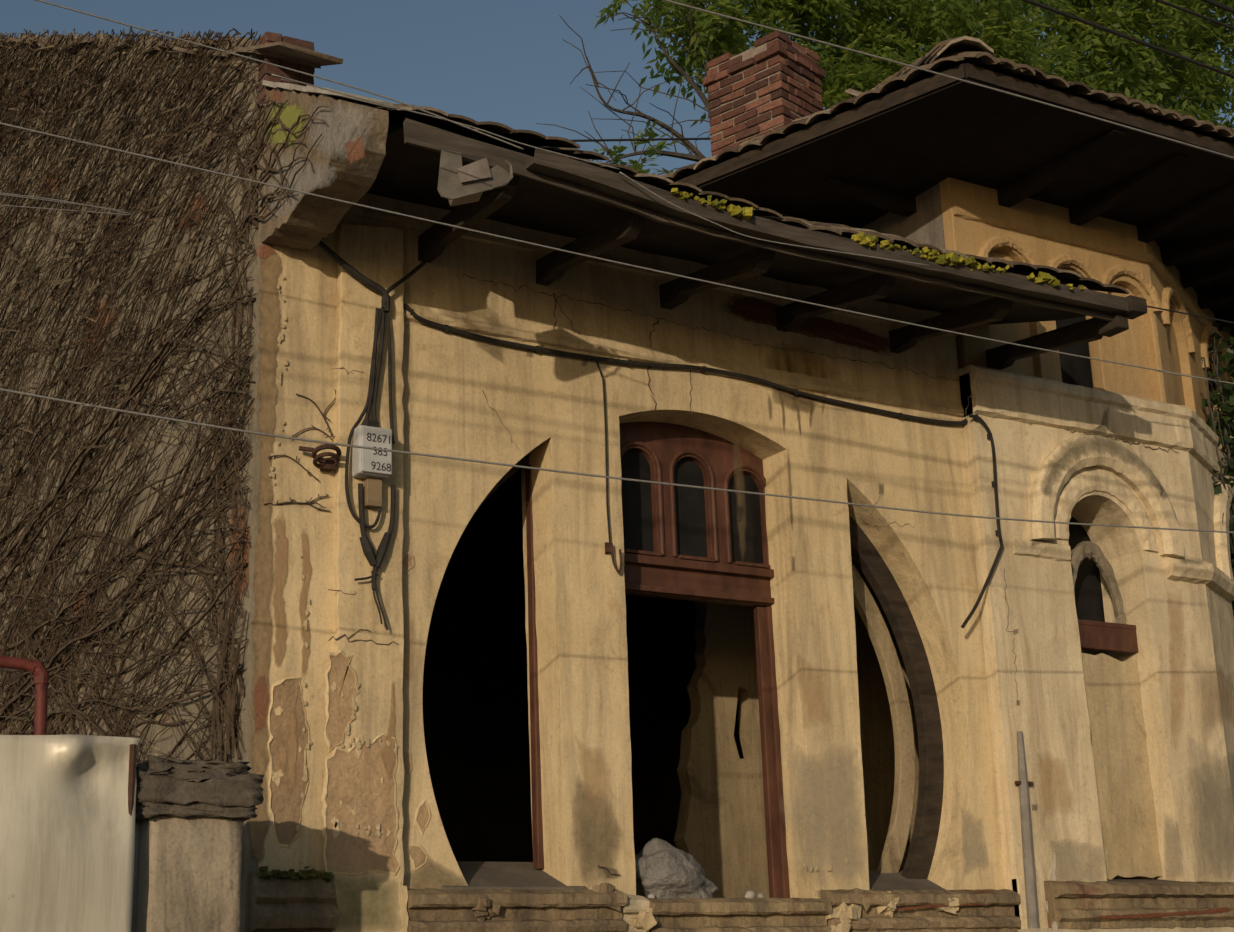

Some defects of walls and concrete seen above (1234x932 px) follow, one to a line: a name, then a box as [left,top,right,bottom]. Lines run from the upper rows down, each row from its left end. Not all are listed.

crack [457,274,972,421]
peeling [229,244,432,876]
crack [328,629,399,645]